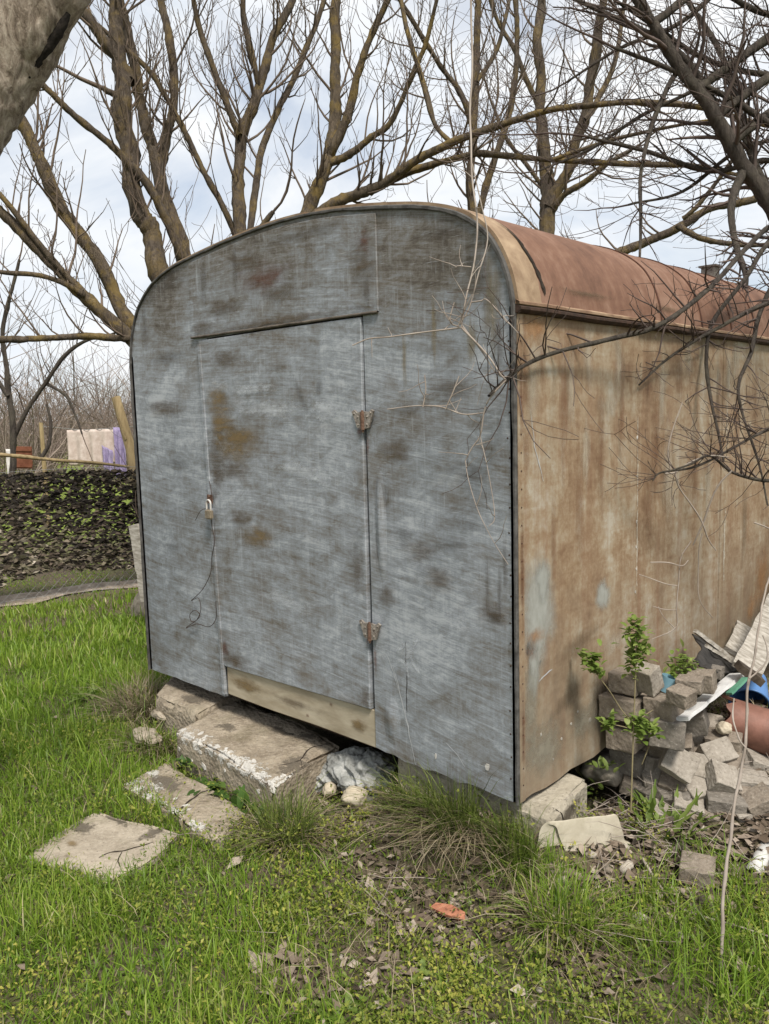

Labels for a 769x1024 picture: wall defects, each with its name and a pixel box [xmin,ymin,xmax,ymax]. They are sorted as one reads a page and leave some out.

corrosion [210,390,252,481]